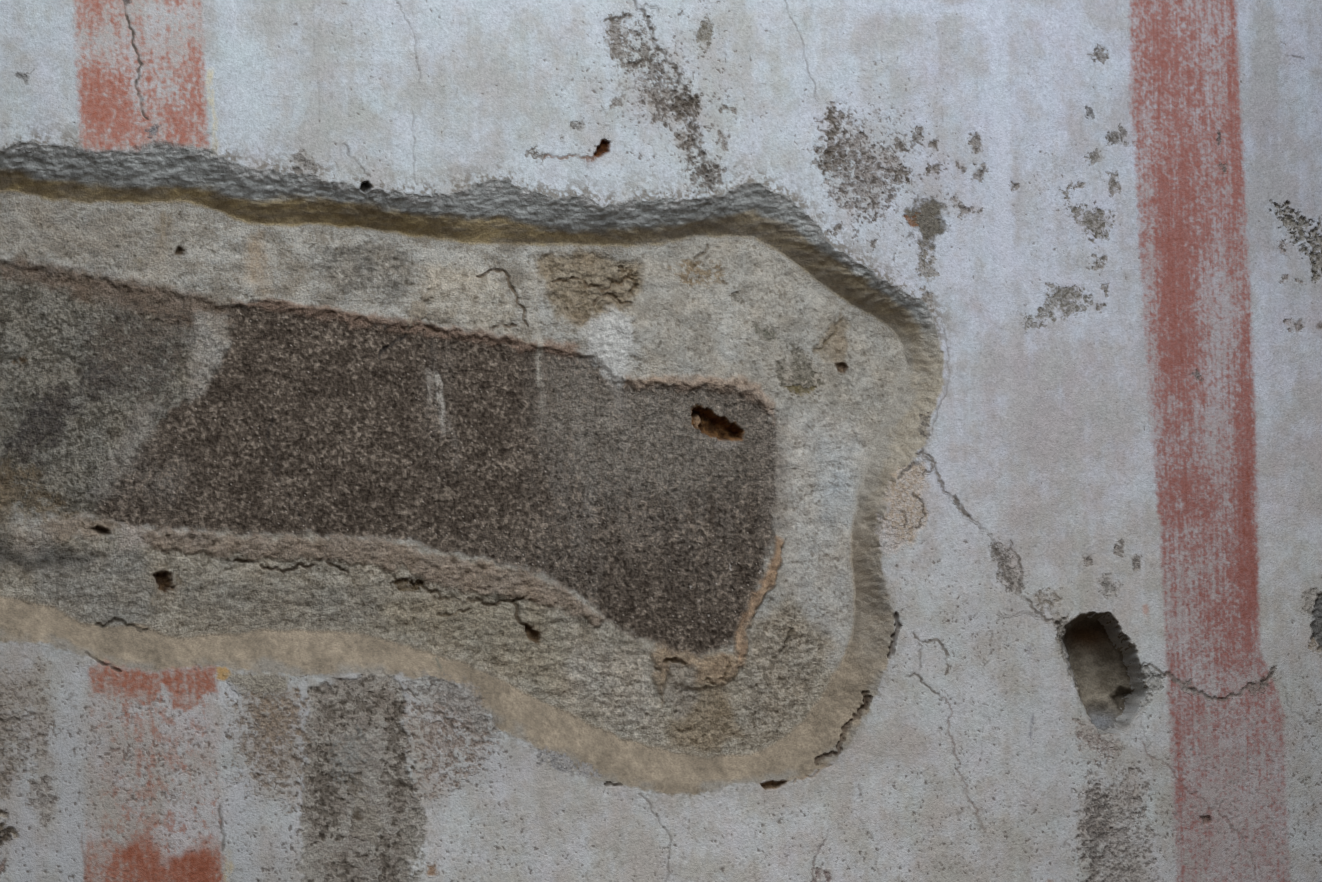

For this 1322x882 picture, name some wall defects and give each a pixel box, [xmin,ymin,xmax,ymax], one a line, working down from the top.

crack [121,0,162,140]
spalling [1084,105,1096,120]
spalling [1020,122,1135,334]
spalling [1268,192,1322,288]
spalling [1283,318,1322,333]
spalling [0,11,990,882]
crack [916,320,1062,633]
spalling [1300,577,1322,657]
peeling [988,537,1165,882]